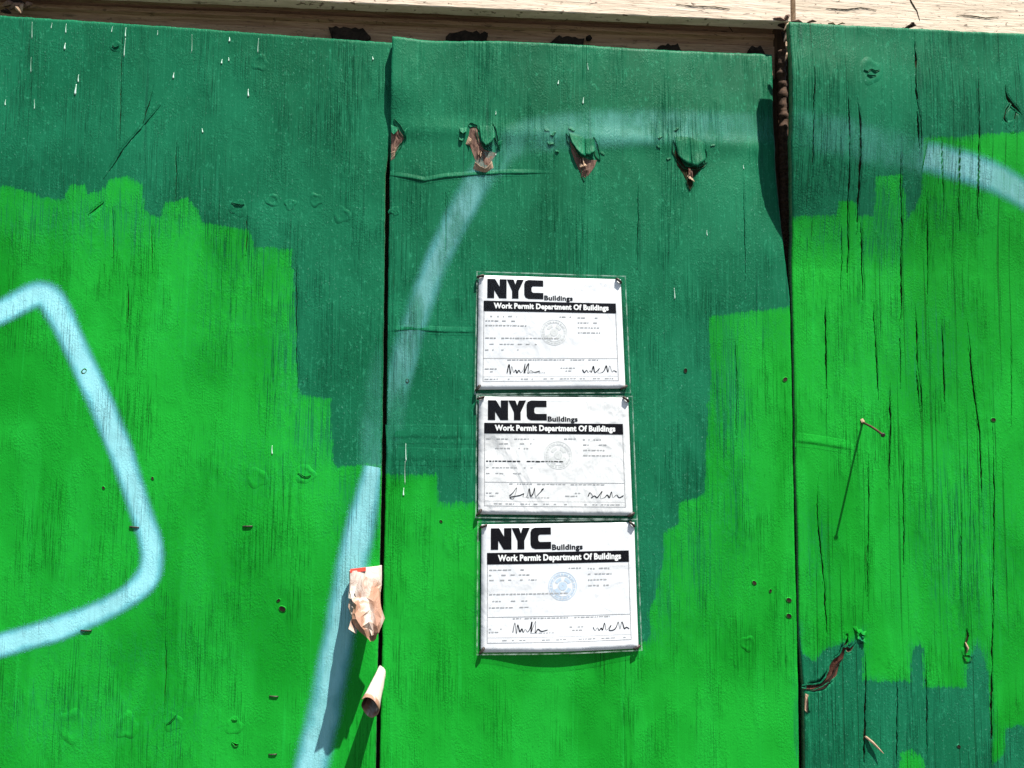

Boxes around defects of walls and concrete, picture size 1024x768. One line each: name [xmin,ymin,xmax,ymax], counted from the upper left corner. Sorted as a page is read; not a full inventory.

peeling [391,118,409,160]
peeling [459,123,503,172]
peeling [544,126,605,181]
peeling [656,127,715,190]
crack [809,57,817,177]
crack [823,0,1022,768]
crack [801,476,868,768]